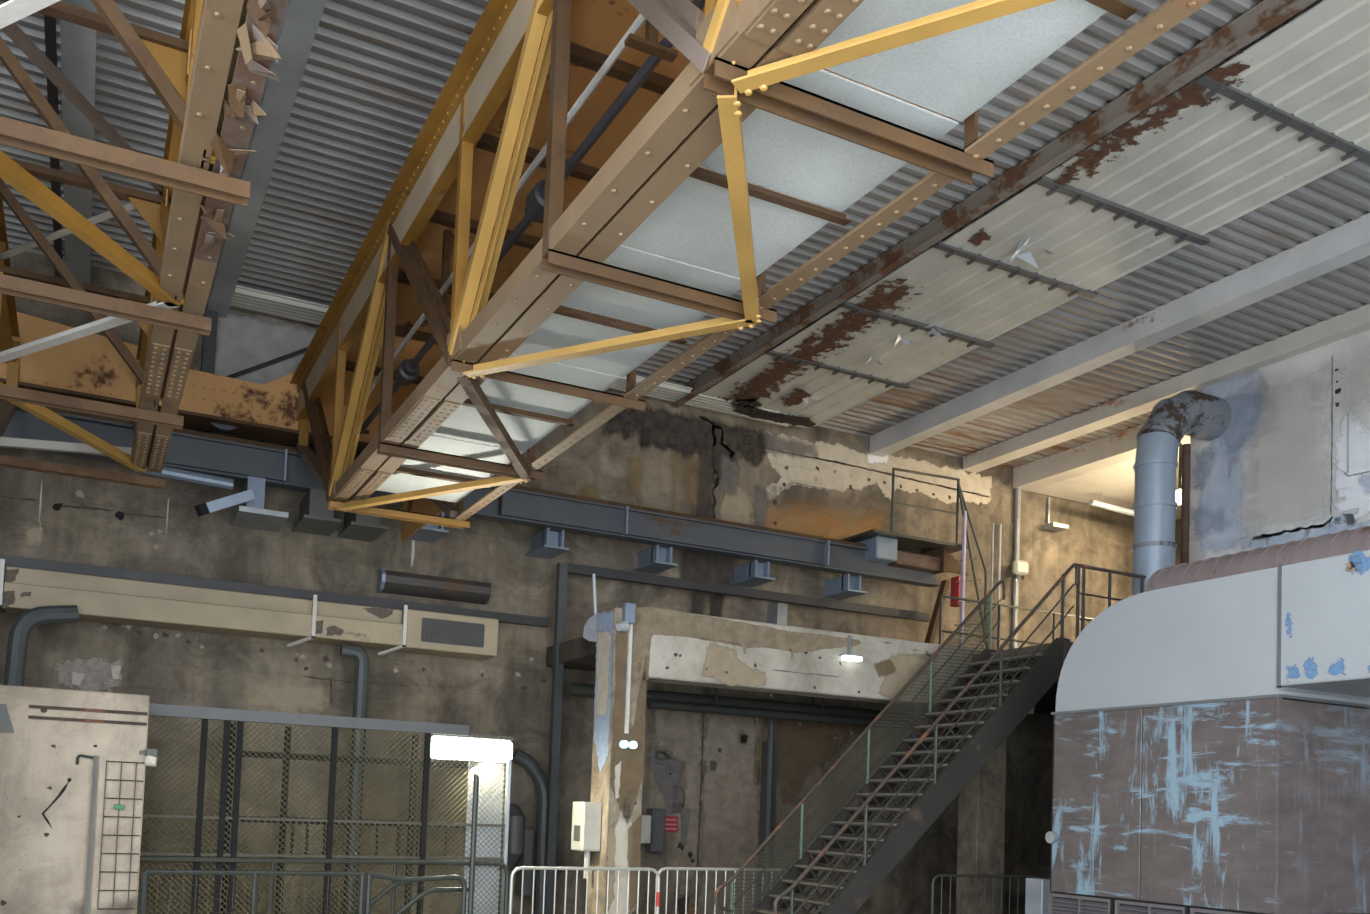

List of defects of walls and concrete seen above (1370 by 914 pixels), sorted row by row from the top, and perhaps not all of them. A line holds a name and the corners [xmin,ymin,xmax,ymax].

rust [1049,52,1250,186]
rust [967,228,991,247]
rust [717,279,923,409]
peeling [631,607,861,698]
peeling [594,611,637,914]
peeling [639,709,761,914]